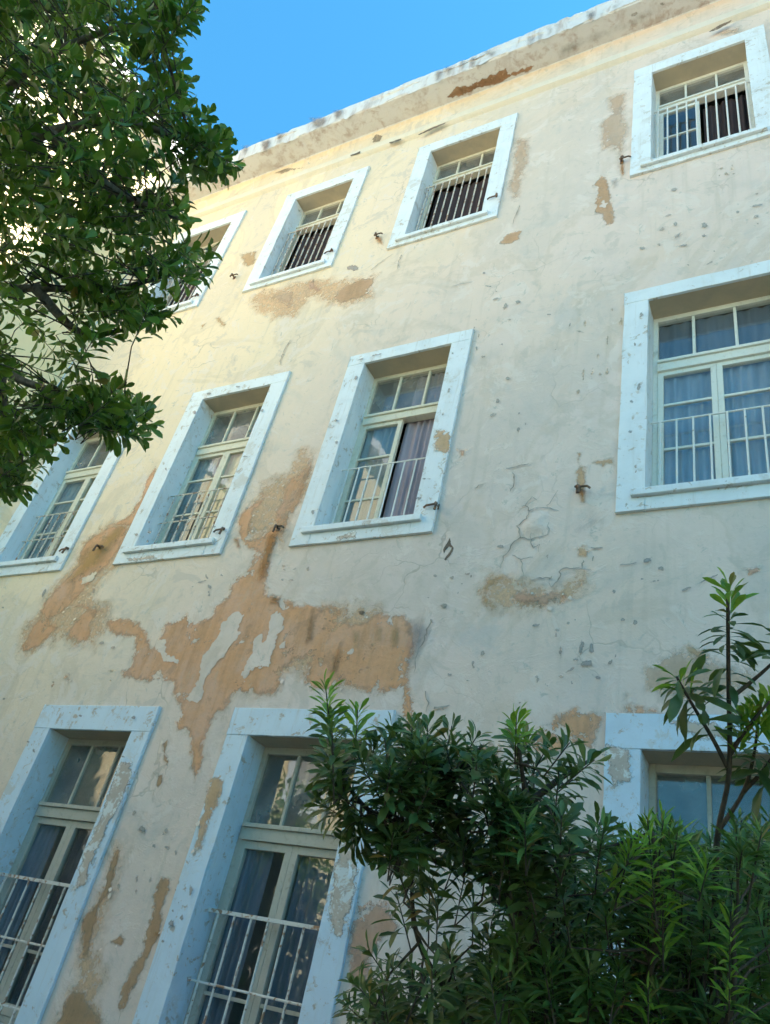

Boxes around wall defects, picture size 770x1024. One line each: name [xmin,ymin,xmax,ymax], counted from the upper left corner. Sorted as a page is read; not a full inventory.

spalling [448,66,533,98]
flaking render [595,176,615,224]
flaking render [253,265,373,318]
crack [499,464,636,588]
flaking render [21,450,413,775]
flaking render [534,708,631,786]
flaking render [670,721,725,740]
flaking render [74,756,132,890]
flaking render [191,777,223,853]
flaking render [57,849,124,1024]
flaking render [118,870,183,1009]
flaking render [329,815,397,987]